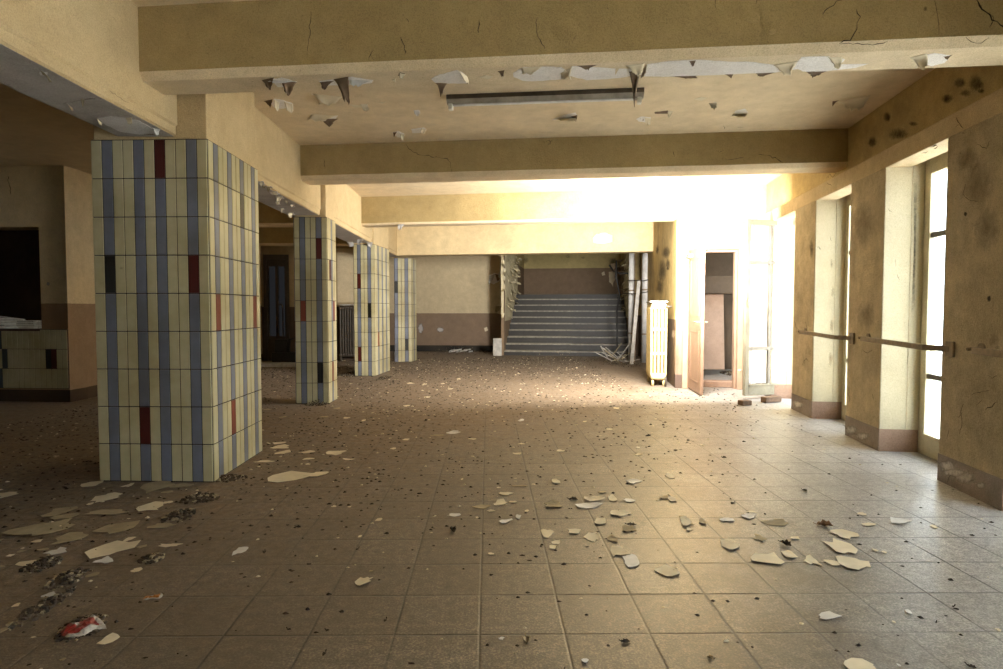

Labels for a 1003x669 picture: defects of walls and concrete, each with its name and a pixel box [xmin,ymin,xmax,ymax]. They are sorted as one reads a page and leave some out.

crack [824,0,885,45]
crack [966,0,1003,43]
peeling [262,77,297,113]
peeling [308,77,373,127]
peeling [432,70,469,97]
peeling [481,56,871,126]
peeling [910,53,952,71]
peeling [258,181,295,218]